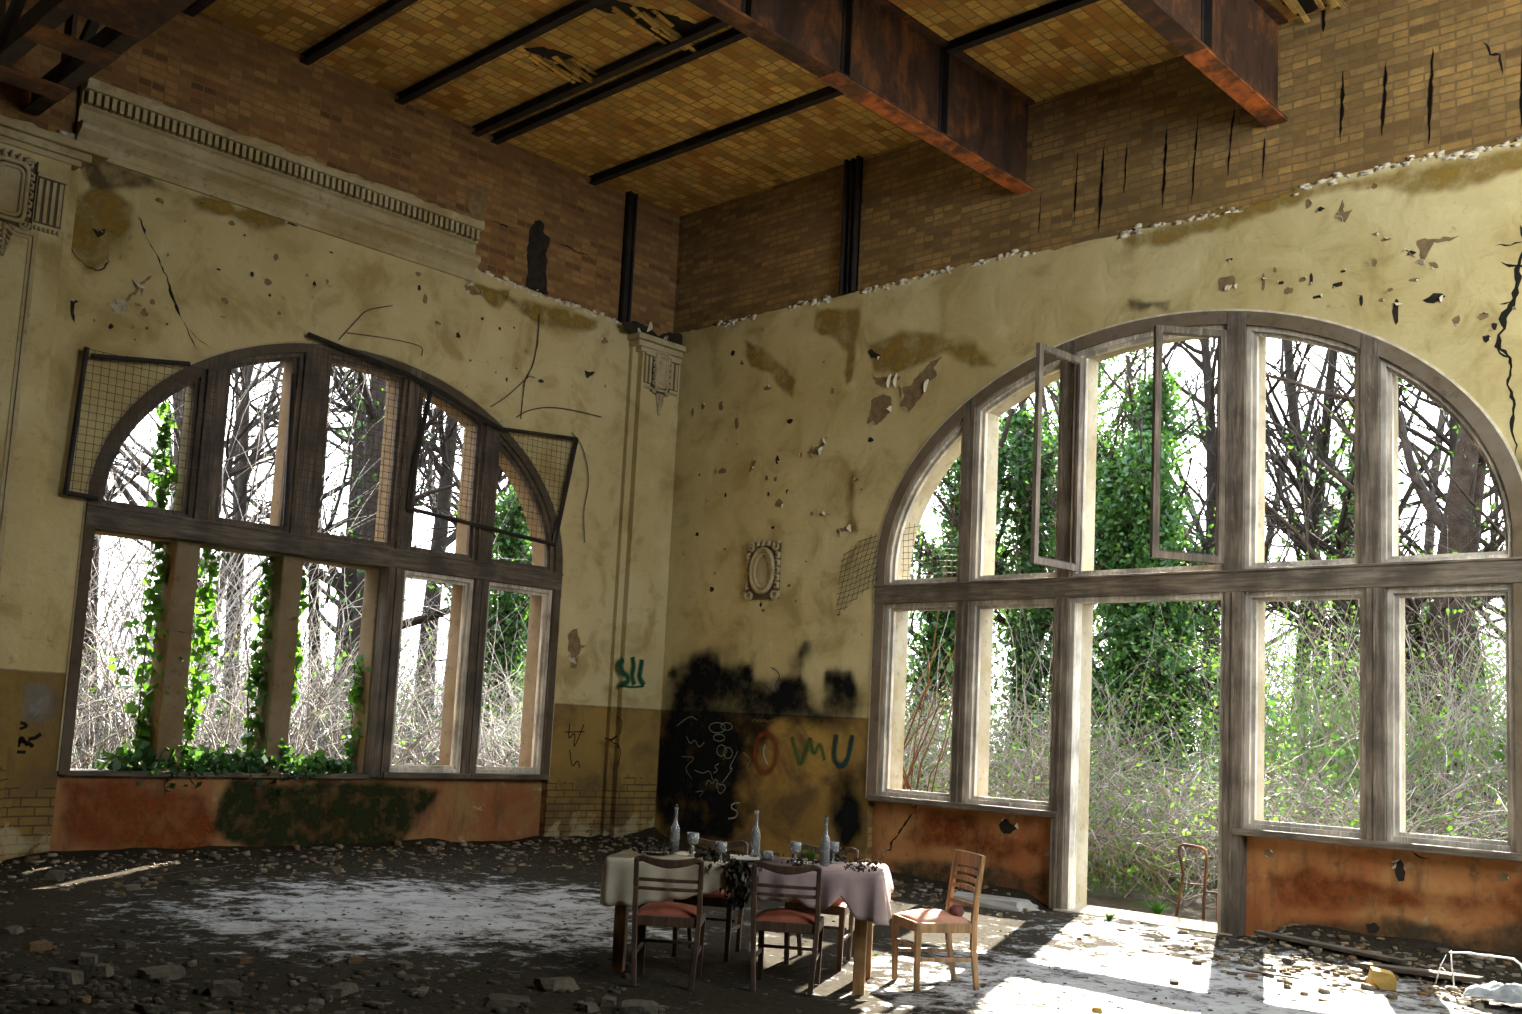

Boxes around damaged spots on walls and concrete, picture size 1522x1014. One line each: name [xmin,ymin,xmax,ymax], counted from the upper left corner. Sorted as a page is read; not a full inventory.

crack [1483,42,1503,74]
flaking render [1218,258,1238,292]
flaking render [1262,266,1346,299]
flaking render [1358,232,1460,324]
flaking render [1452,312,1497,343]
crack [1494,242,1522,454]
flaking render [867,357,941,442]